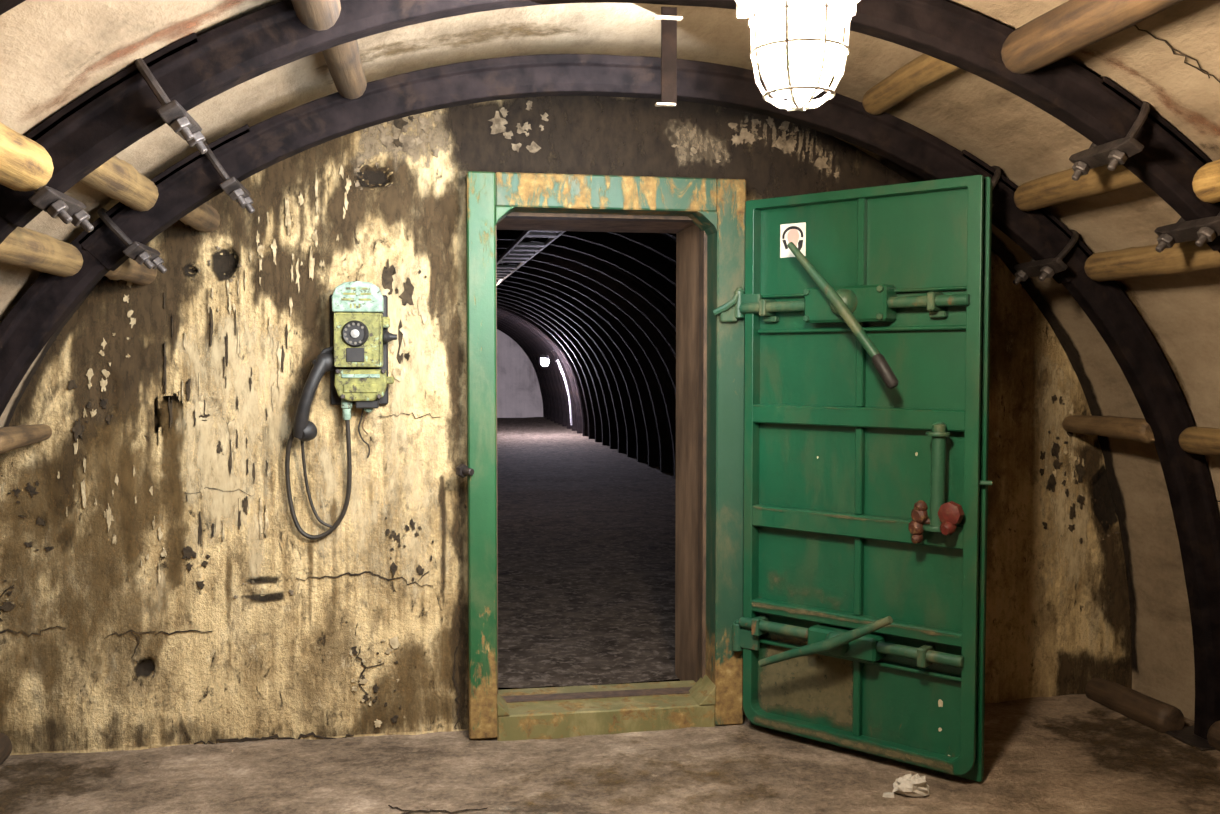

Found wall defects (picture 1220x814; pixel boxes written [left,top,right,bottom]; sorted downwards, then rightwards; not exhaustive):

crack [1134,25,1220,83]
peeling [488,101,549,153]
peeling [669,116,839,178]
leakage [991,232,1102,416]
leakage [0,96,928,814]
crack [297,571,432,586]
leakage [1056,435,1138,696]
crack [0,586,66,636]
crack [104,630,212,658]
crack [356,646,383,700]
leakage [1035,709,1220,804]
crack [388,805,488,814]